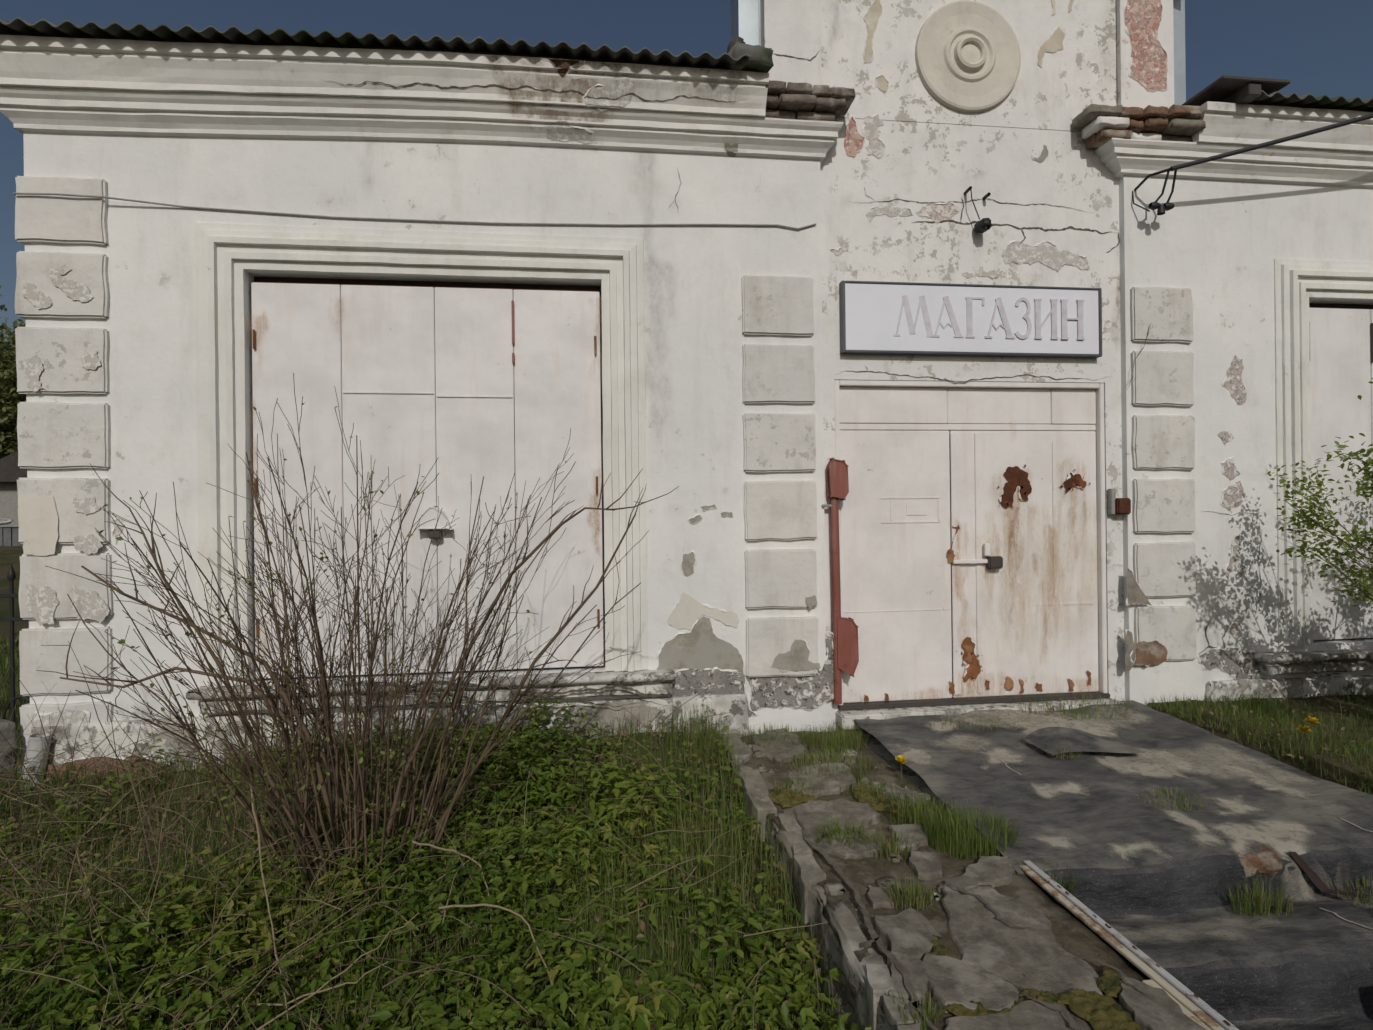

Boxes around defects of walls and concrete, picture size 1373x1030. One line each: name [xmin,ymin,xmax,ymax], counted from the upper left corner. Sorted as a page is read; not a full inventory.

peeling [862,0,889,92]
peeling [1123,0,1168,92]
crack [332,81,749,102]
peeling [844,114,885,159]
crack [848,187,1120,252]
peeling [963,240,1090,280]
peeling [1221,355,1247,405]
rust [998,465,1043,509]
rust [1058,469,1091,493]
peeling [451,551,834,740]
rust [949,637,1043,694]
spalling [1125,629,1168,671]